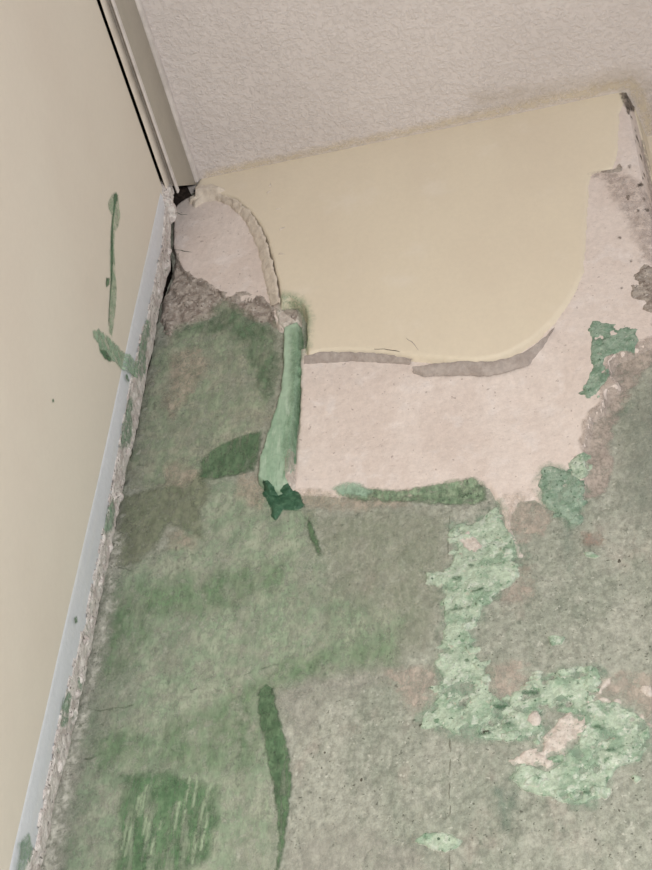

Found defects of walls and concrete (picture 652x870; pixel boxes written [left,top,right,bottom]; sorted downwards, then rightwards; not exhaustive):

crack [161,177,192,215]
crack [129,249,189,466]
peeling [160,96,652,807]
damp [579,338,652,498]
damp [136,785,162,855]
damp [174,774,213,864]
peeling [415,832,463,853]